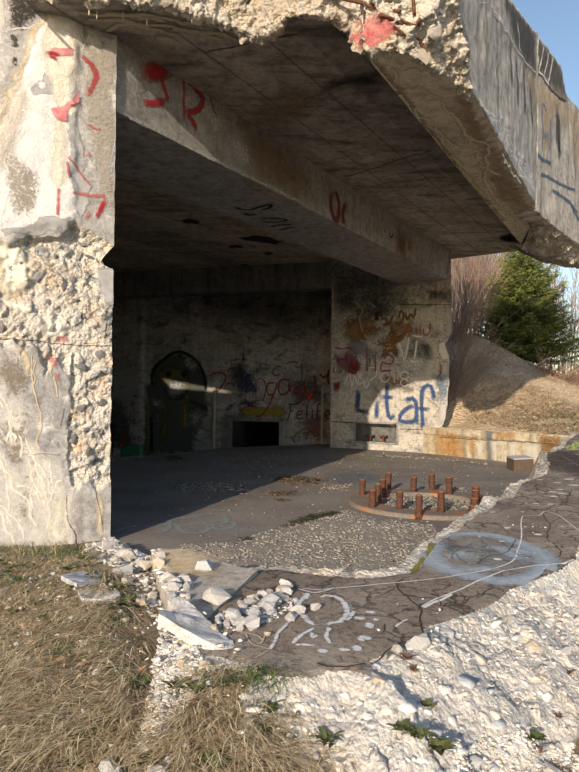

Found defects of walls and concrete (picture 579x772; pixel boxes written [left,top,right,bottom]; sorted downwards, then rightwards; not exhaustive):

spalling [83,0,475,101]
damp [501,0,566,126]
crack [473,83,535,191]
damp [556,111,572,160]
spalling [0,41,147,491]
spalling [500,218,579,269]
crack [0,338,111,448]
corrosion [437,434,461,456]
crack [66,493,76,543]
spalling [102,536,114,550]
crack [452,479,573,571]
crack [317,583,507,667]